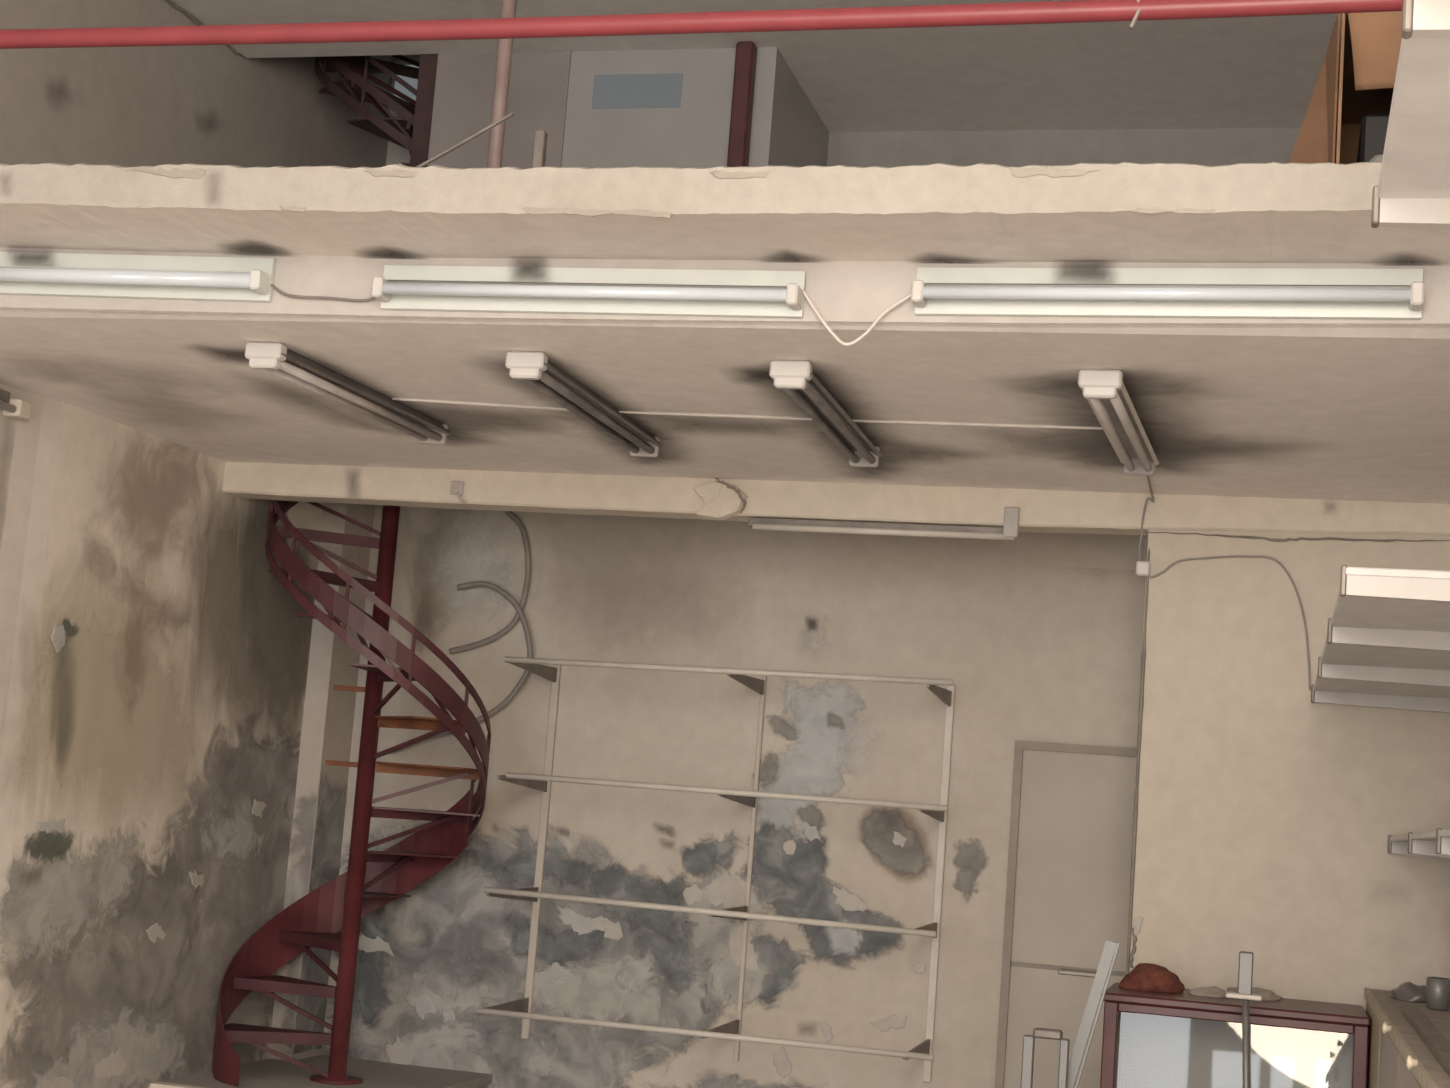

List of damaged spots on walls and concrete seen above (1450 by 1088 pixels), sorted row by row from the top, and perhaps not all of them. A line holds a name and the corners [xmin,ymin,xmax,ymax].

crack [714,478,747,513]
water stain [246,536,303,692]
water stain [58,646,70,753]
spalling [656,682,903,1013]
spalling [862,809,927,876]
spalling [954,840,986,896]
peeling [358,933,394,956]
peeling [374,906,677,1088]
peeling [23,1006,187,1088]